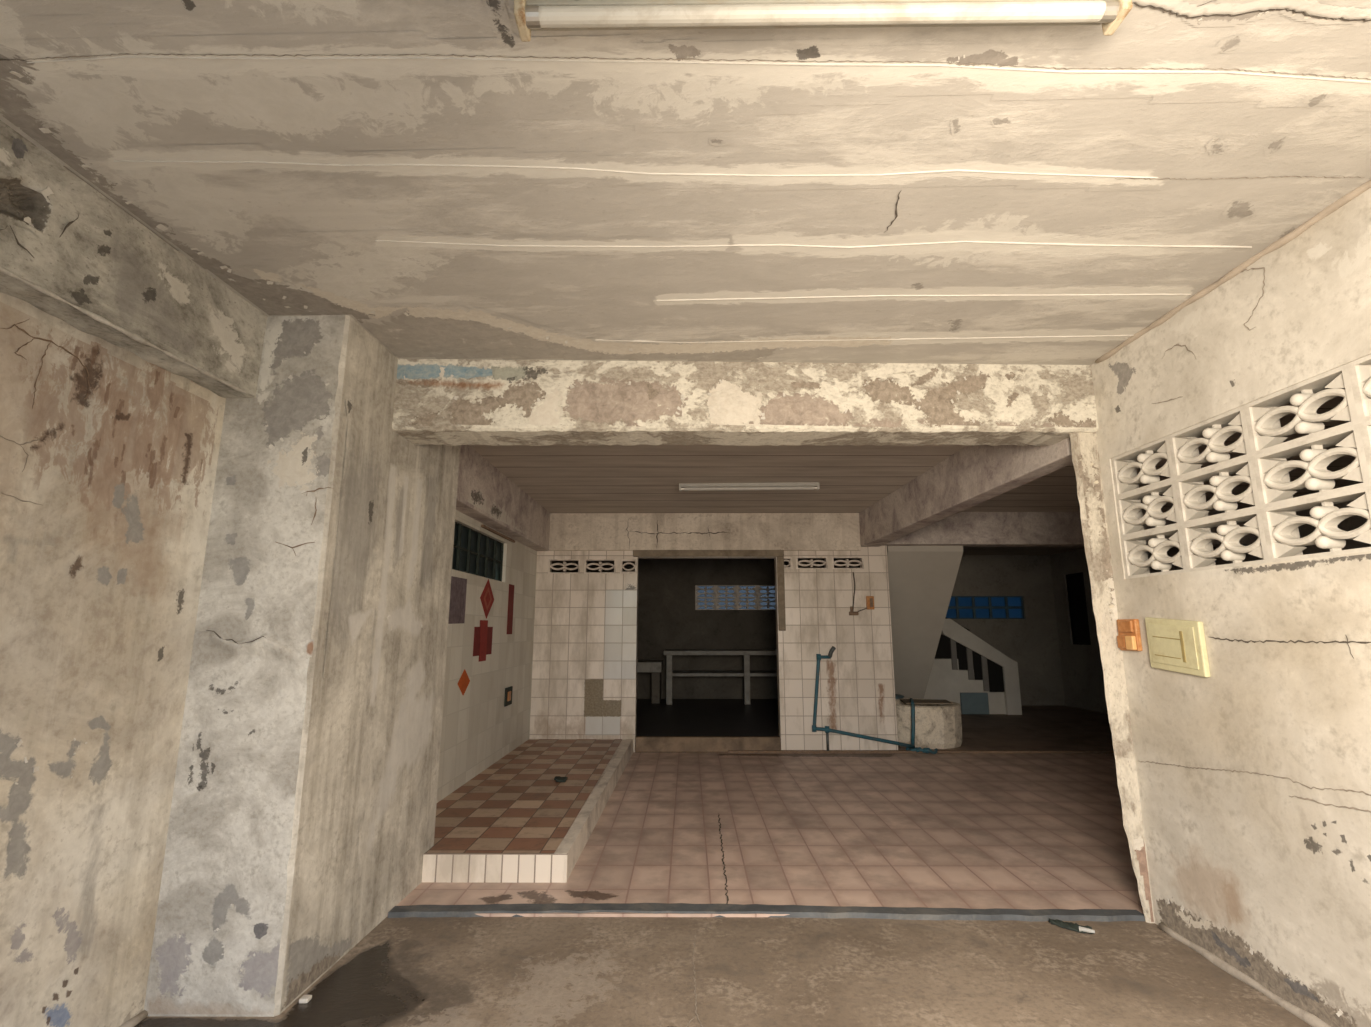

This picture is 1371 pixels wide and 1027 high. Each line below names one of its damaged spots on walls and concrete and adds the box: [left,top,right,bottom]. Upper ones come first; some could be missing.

crack [1132,0,1371,22]
peeling [0,39,1097,495]
crack [0,319,90,505]
peeling [1104,353,1140,415]
crack [1211,636,1371,658]
crack [1139,761,1371,812]
peeling [0,713,116,979]
spalling [1301,819,1371,891]
water stain [91,990,275,1027]
peeling [147,878,362,1011]
water stain [296,934,493,1027]
spalling [1133,834,1369,1027]